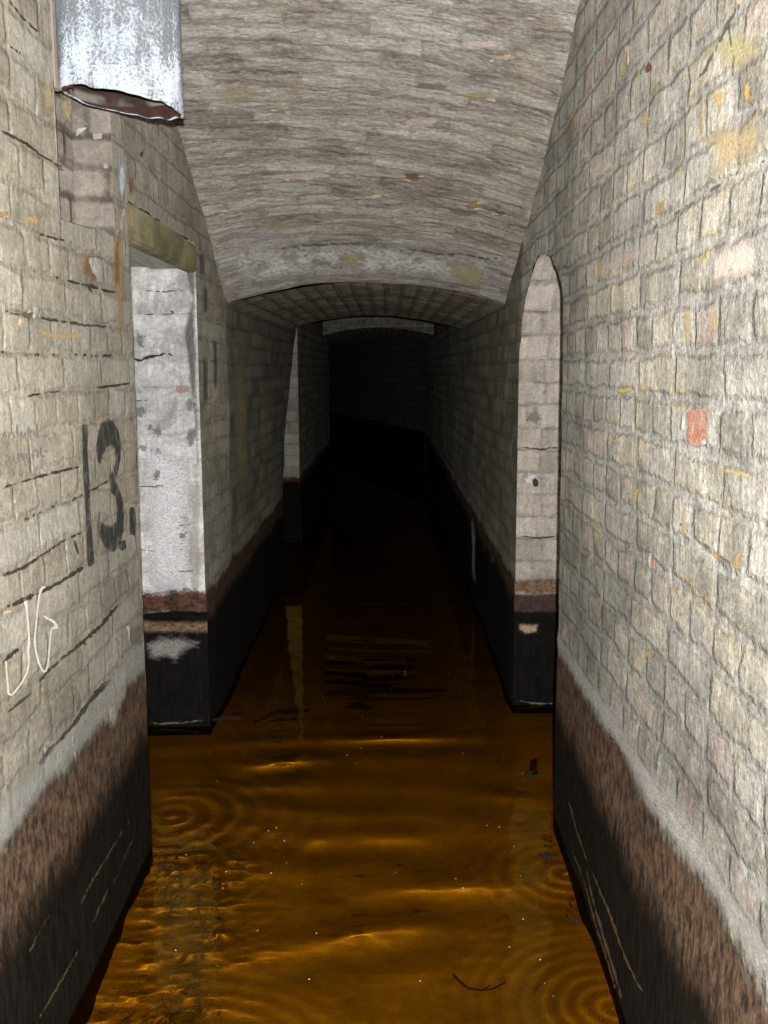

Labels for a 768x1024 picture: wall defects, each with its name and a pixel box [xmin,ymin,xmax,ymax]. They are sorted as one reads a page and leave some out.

leakage [0,407,768,1024]